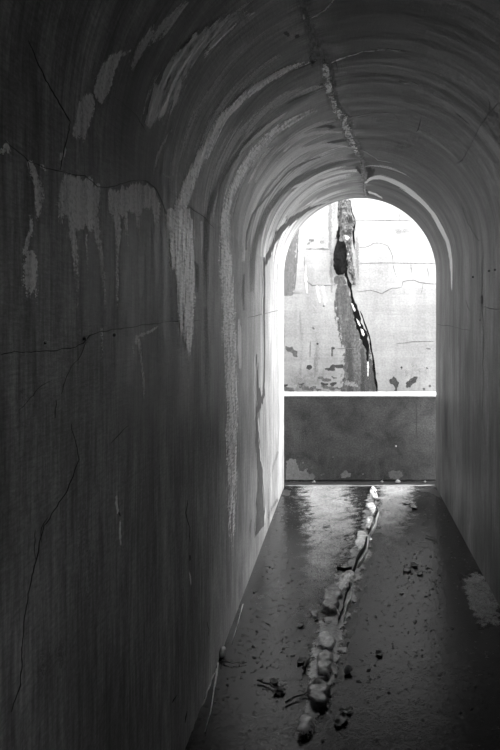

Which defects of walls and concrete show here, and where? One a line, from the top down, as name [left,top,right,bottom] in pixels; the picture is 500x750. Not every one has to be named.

crack [5,40,165,212]
crack [1,320,198,712]
leakage [57,53,453,546]
crack [336,487,379,621]
crack [287,0,433,391]
spalling [389,366,428,391]